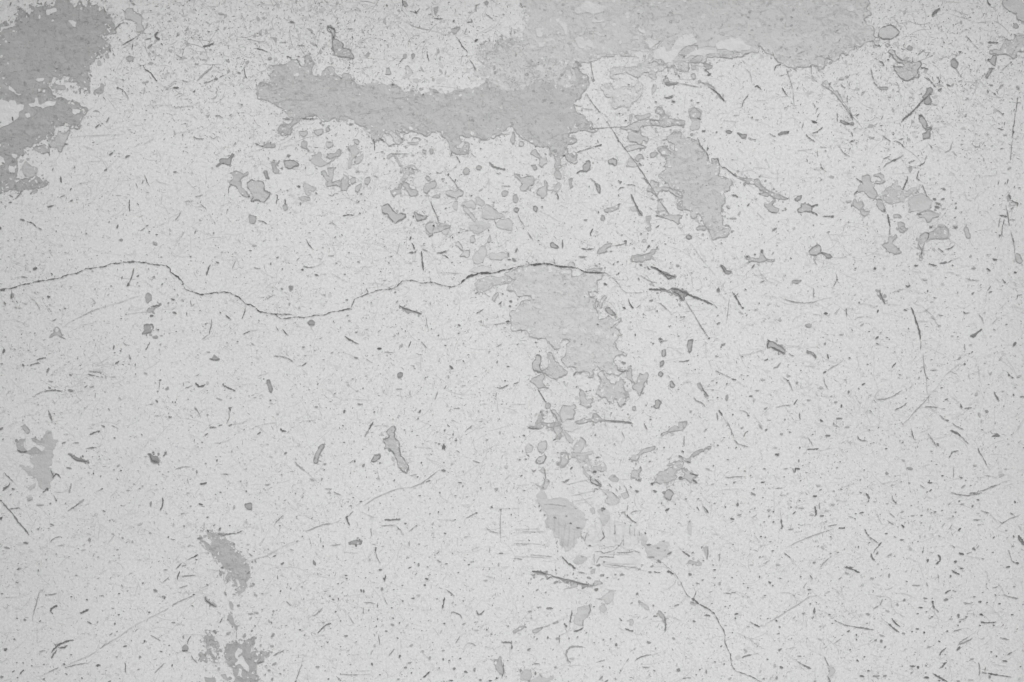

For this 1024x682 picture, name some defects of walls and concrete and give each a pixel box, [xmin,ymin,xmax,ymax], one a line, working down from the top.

peeling [0,0,151,194]
crack [0,261,643,319]
peeling [216,0,951,514]